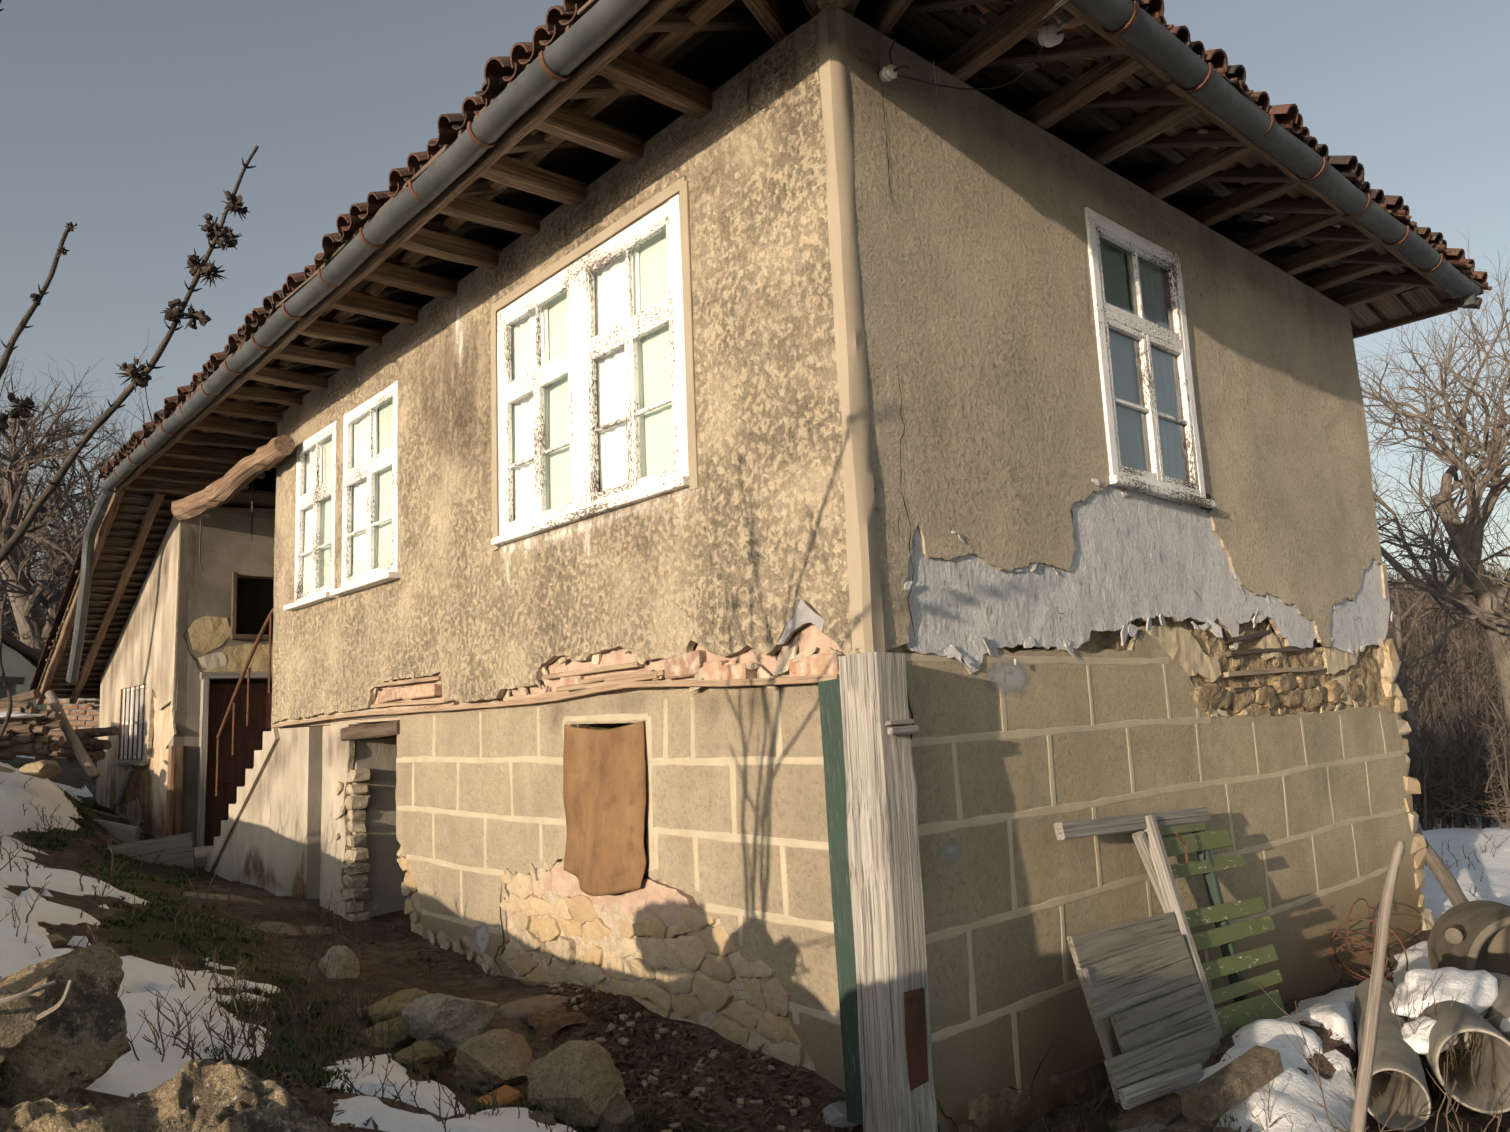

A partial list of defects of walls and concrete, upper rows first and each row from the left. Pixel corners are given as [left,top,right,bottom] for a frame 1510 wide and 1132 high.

crack [877,43,895,217]
crack [897,363,915,637]
flaking render [370,671,459,710]
flaking render [503,599,846,701]
peeling [904,478,1398,722]